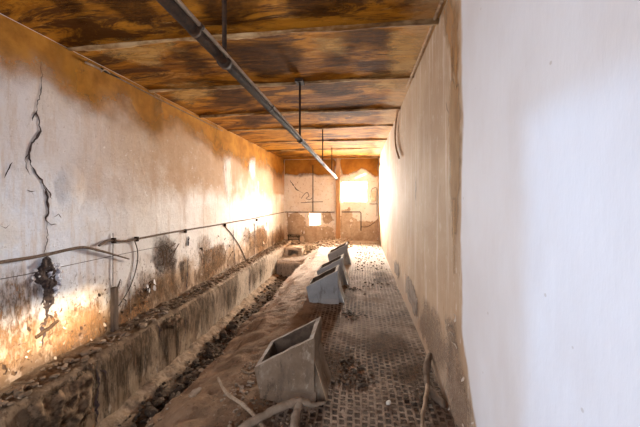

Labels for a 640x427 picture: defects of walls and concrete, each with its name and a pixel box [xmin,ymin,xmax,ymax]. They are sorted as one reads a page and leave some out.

crack [5,64,61,252]
water stain [109,0,156,24]
water stain [0,14,379,201]
water stain [316,28,419,89]
spalling [0,256,110,376]
water stain [52,327,152,396]